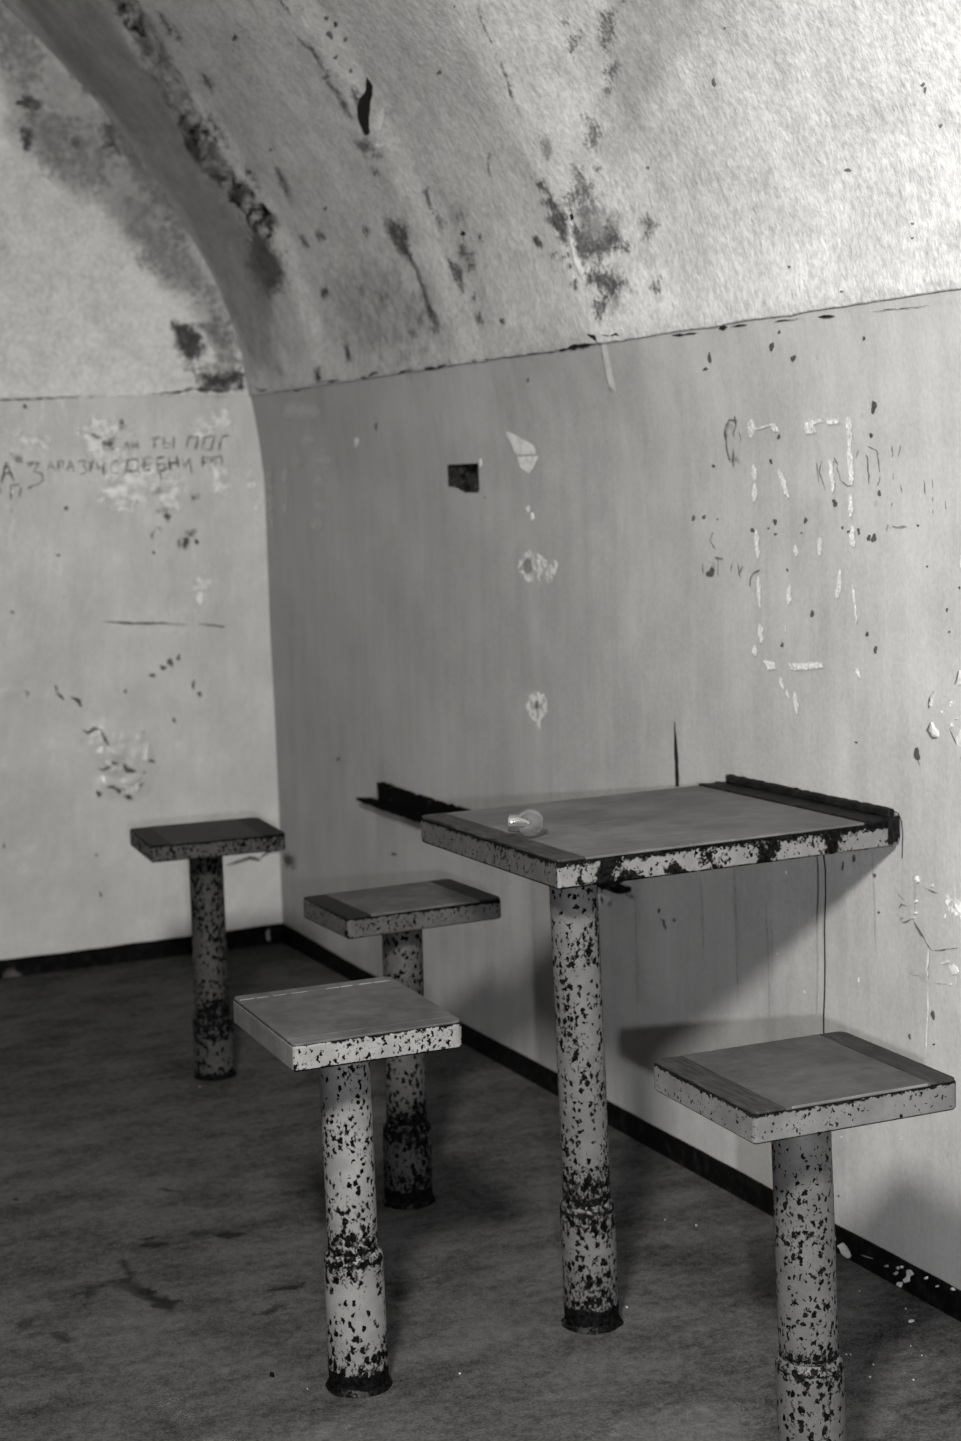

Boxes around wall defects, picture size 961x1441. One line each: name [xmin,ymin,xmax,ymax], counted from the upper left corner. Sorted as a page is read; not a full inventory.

damp [249,228,284,298]
damp [533,166,657,320]
damp [170,319,246,393]
spalling [447,458,486,498]
peeling [506,431,538,474]
peeling [914,697,961,763]
peeling [835,1237,955,1290]